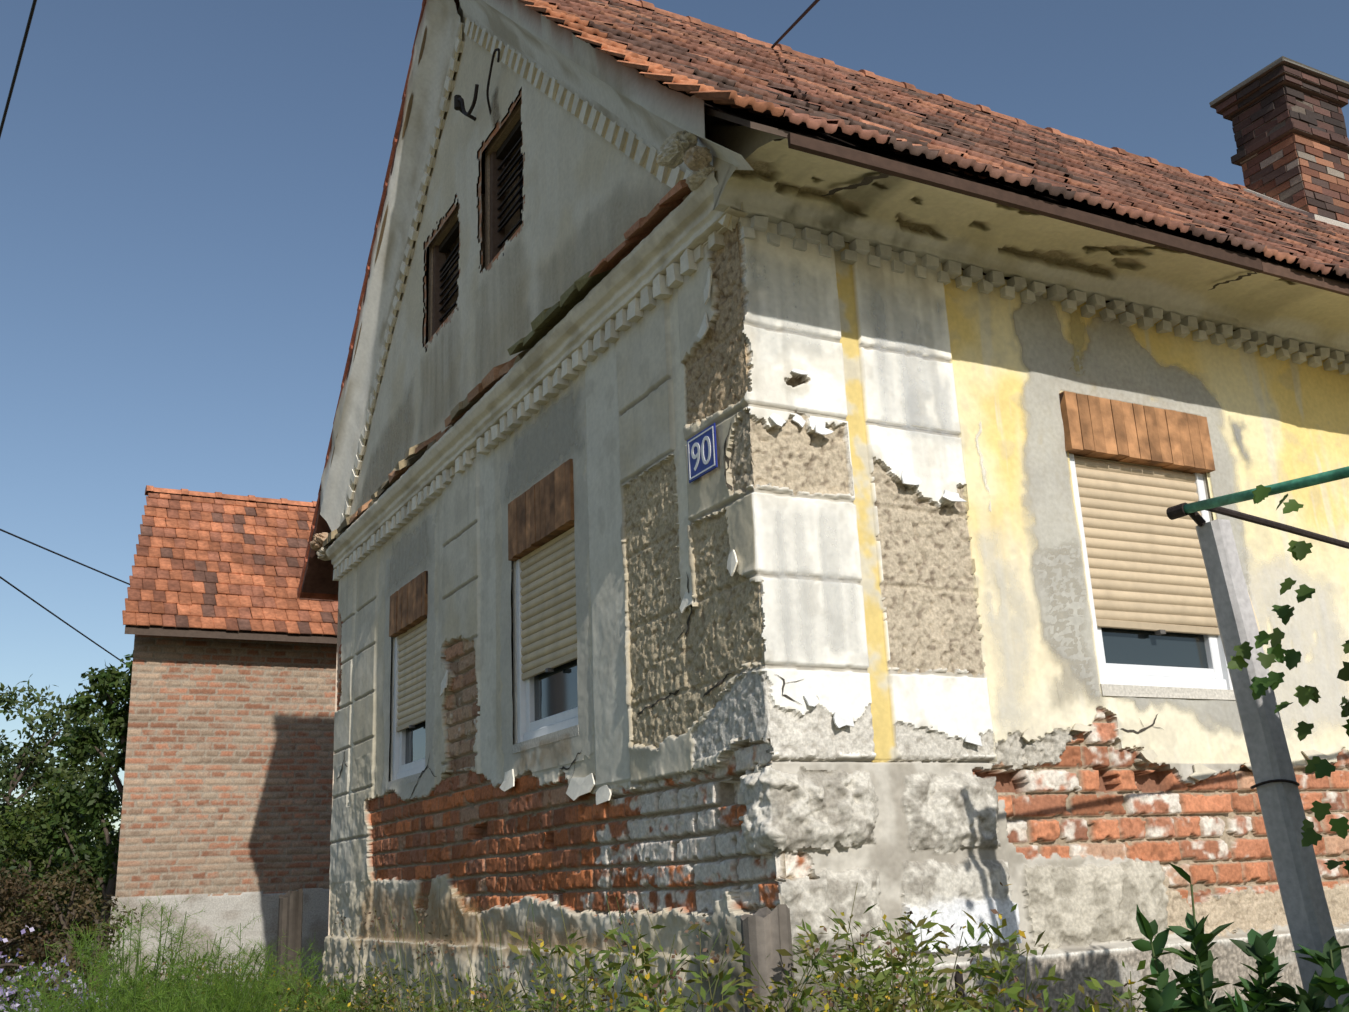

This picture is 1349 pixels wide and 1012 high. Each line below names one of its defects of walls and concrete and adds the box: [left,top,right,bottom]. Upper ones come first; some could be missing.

spalling [682,217,854,496]
spalling [871,456,986,677]
water stain [1013,296,1349,724]
flaking render [366,455,875,914]
flaking render [895,706,1288,936]
water stain [1119,696,1243,734]
flaking render [1292,747,1349,927]